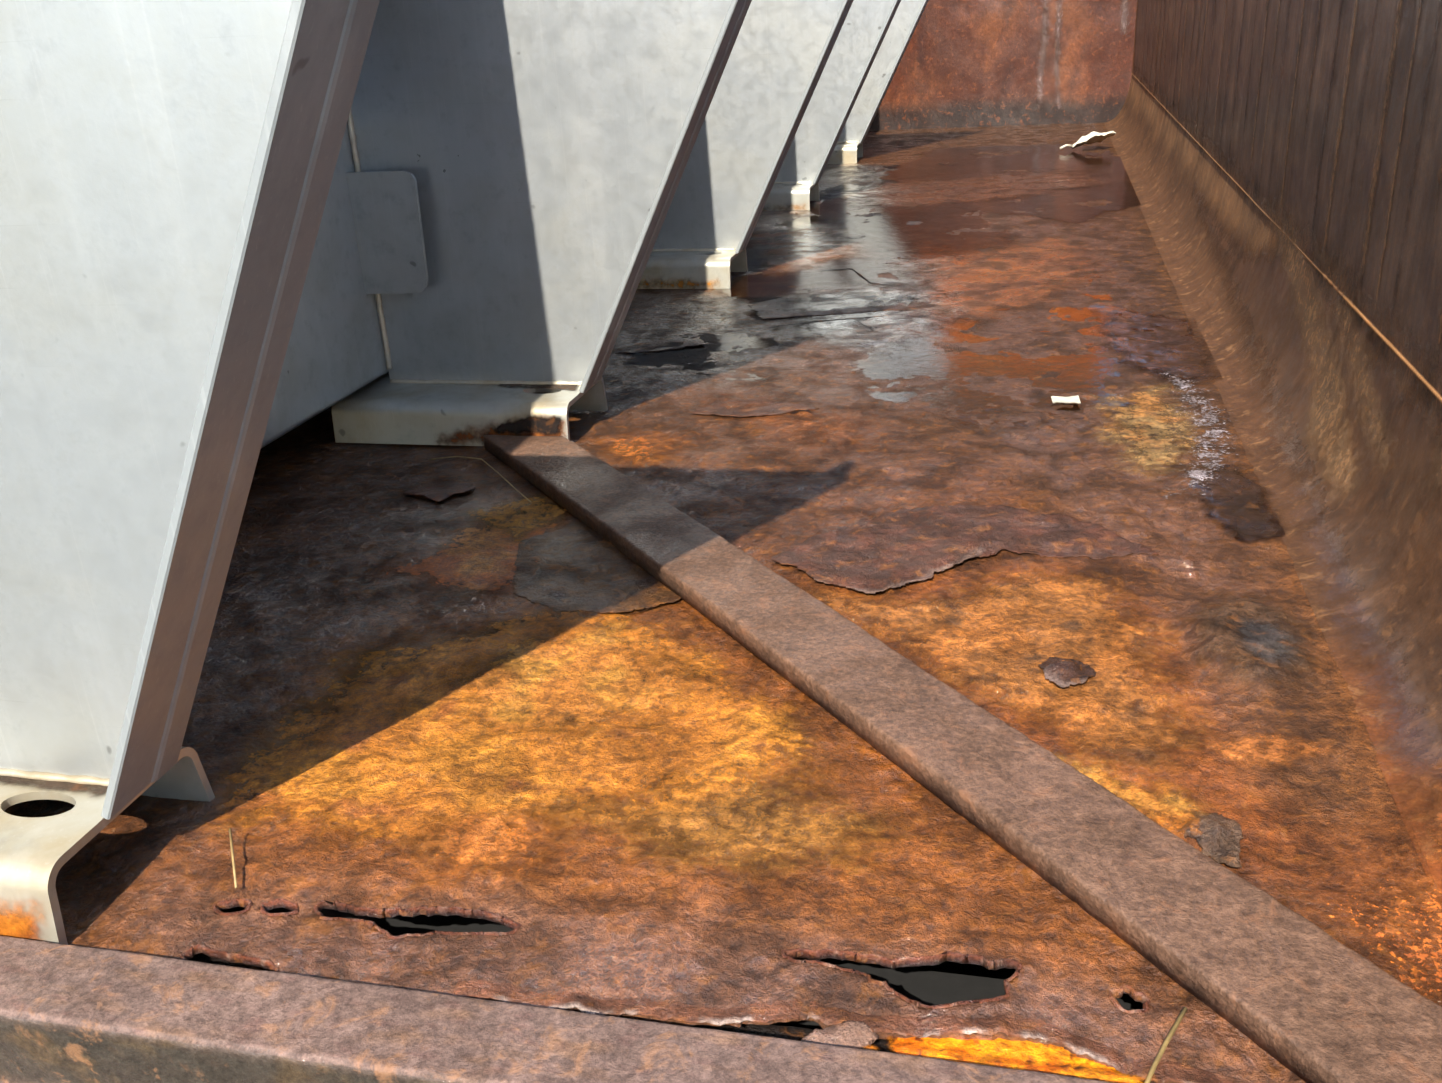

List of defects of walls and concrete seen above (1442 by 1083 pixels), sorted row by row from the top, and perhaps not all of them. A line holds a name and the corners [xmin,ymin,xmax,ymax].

water stain [823,168,1110,207]
water stain [748,223,858,272]
water stain [784,237,1101,348]
rust [609,435,686,463]
water stain [1090,306,1285,543]
water stain [1121,0,1442,792]
rust [384,496,567,593]
rust [220,610,880,874]
rust [807,572,1323,868]
rust [1327,782,1442,996]
peeling [451,979,1238,1083]
rust [864,1036,1143,1083]